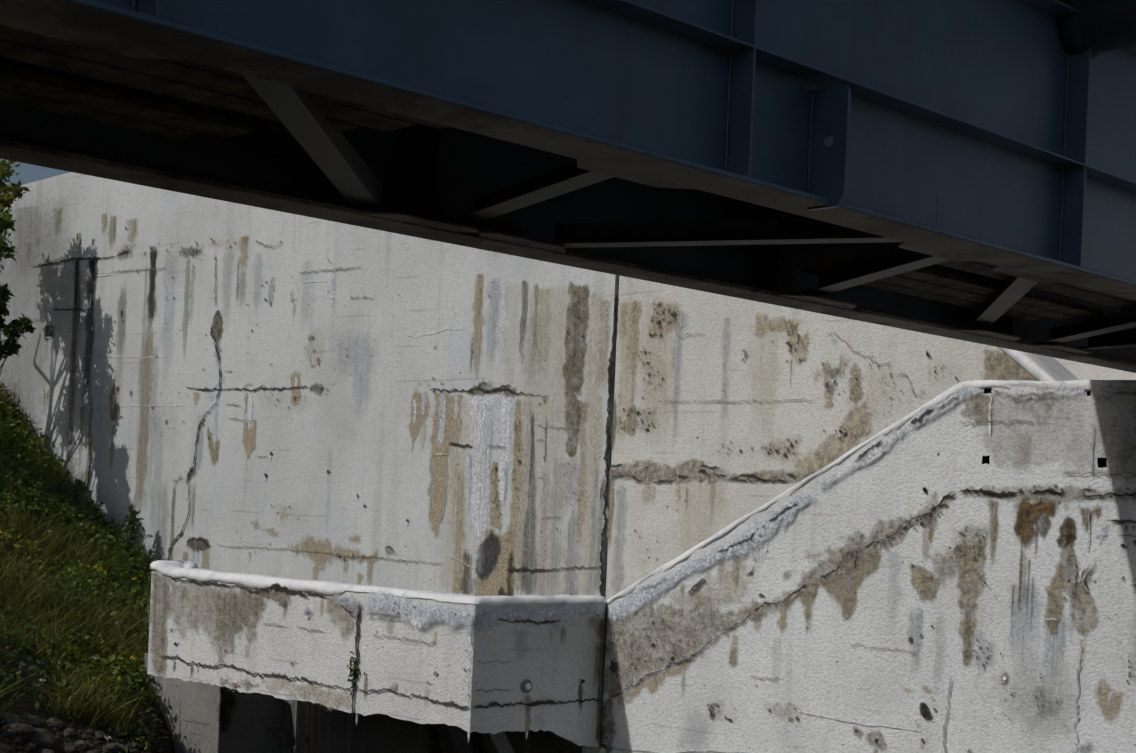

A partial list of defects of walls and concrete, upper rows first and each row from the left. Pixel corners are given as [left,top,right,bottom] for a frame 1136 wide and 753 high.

damp [64,233,98,483]
damp [109,385,118,420]
damp [562,282,601,530]
damp [627,301,641,365]
damp [166,578,290,651]
damp [409,391,547,596]
crack [140,296,1136,753]
spalling [364,349,1136,709]
damp [778,552,880,629]
damp [909,541,985,665]
damp [1045,564,1097,654]
spalling [919,687,936,720]